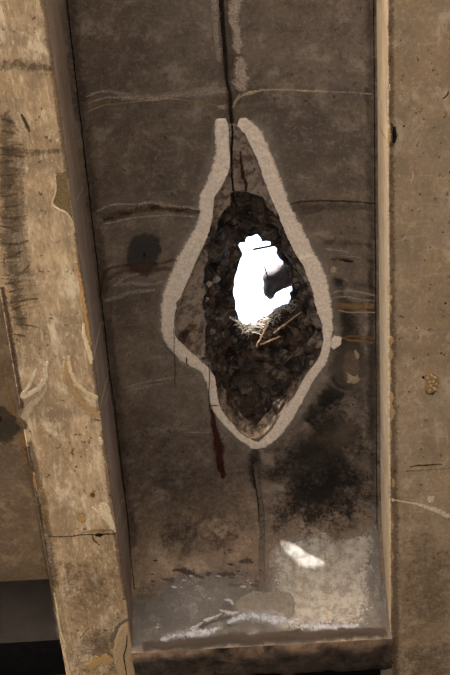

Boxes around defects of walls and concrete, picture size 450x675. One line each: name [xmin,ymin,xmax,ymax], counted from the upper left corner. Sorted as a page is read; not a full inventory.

leakage [105,234,164,302]
crack [49,0,378,590]
hole [174,123,323,439]
corrosion [210,408,226,479]
leakage [129,449,393,653]